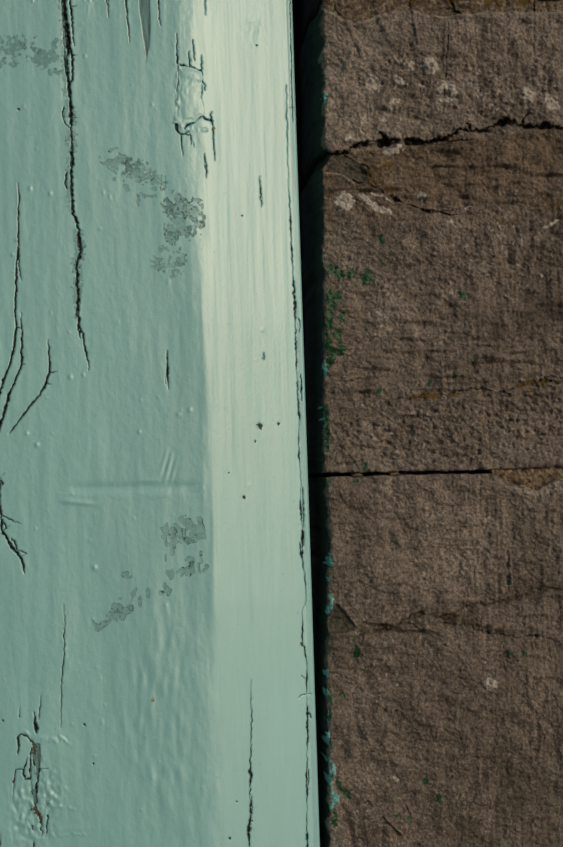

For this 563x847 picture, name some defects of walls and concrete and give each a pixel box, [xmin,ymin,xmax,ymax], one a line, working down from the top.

peeling [139,0,150,63]
crack [158,0,215,178]
crack [443,1,461,114]
crack [61,0,89,371]
peeling [99,148,206,279]
crack [315,114,563,216]
crack [0,187,54,431]
crack [286,1,311,847]
crack [0,506,27,574]
peeling [159,518,209,596]
crack [13,700,49,847]
crack [246,695,254,847]